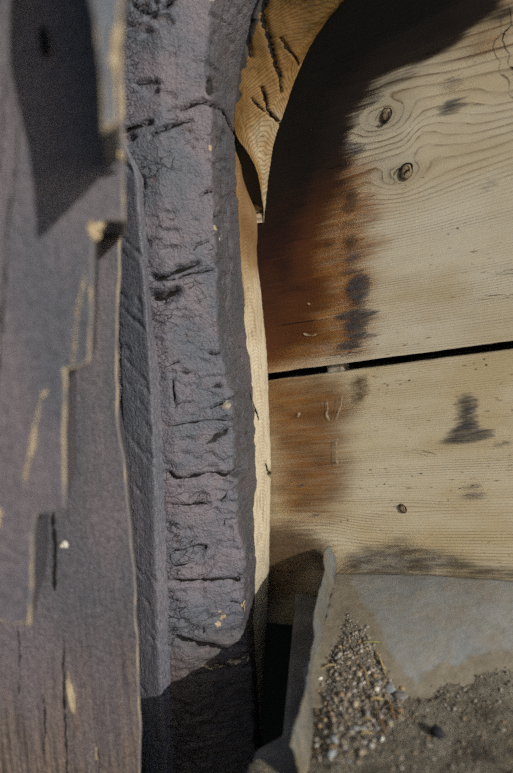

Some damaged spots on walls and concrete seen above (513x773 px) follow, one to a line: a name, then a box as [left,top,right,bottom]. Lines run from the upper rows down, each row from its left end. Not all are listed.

crack [246,0,299,118]
crack [502,5,513,70]
water stain [336,271,380,350]
water stain [268,376,352,516]
water stain [357,377,368,401]
water stain [444,393,495,443]
crack [50,512,58,591]
crack [43,637,68,773]